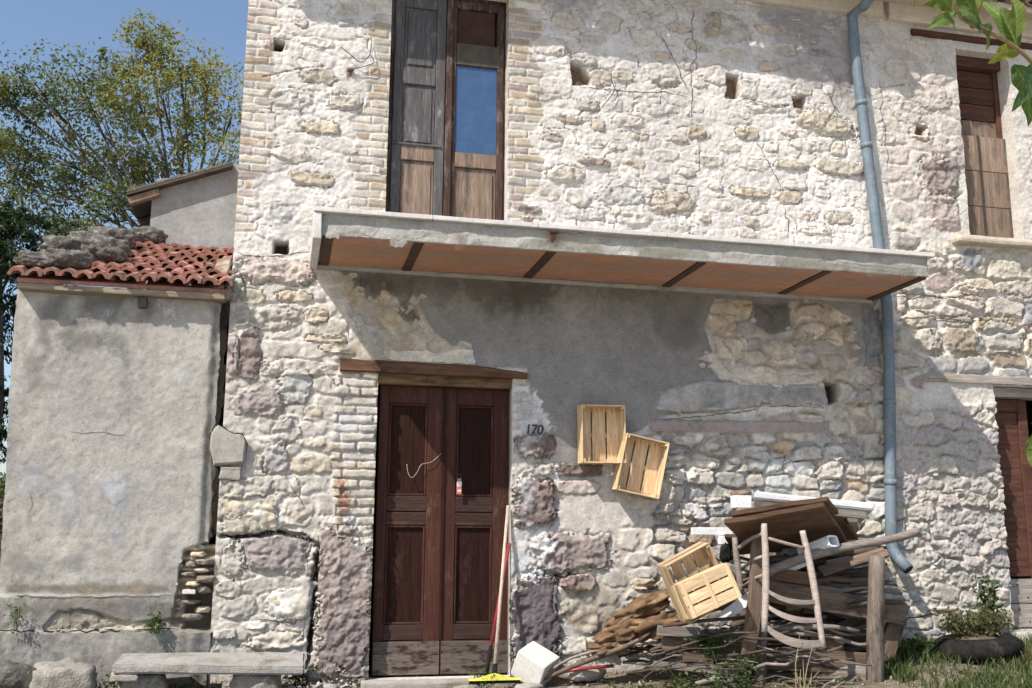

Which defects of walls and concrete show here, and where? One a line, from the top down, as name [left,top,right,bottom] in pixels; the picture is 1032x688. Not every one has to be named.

crack [588,7,700,195]
crack [755,139,790,231]
flaking render [335,273,476,365]
flaking render [657,299,861,416]
peeling [323,405,375,470]
peeling [219,466,241,480]
flaking render [221,494,277,531]
peeling [351,517,372,548]
flaking render [271,581,318,622]